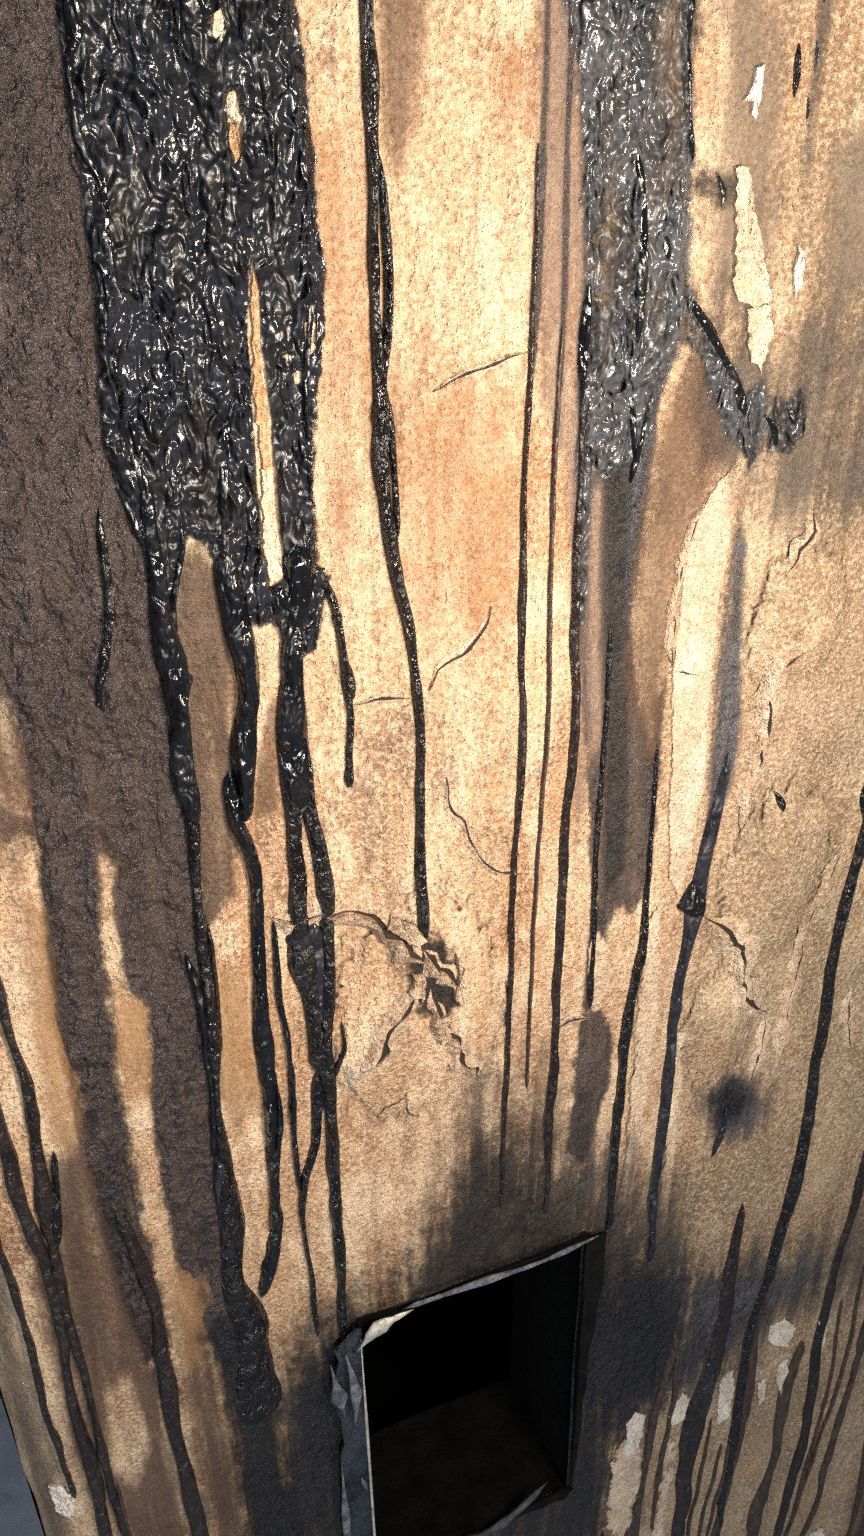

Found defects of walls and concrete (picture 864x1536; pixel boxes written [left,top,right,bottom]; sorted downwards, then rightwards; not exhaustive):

spalling [730,165,774,374]
damp [95,506,116,707]
damp [317,565,355,788]
damp [445,0,864,1536]
damp [0,543,347,1536]
crack [264,891,490,1118]
spalling [716,1369,735,1424]
spalling [757,1318,796,1407]